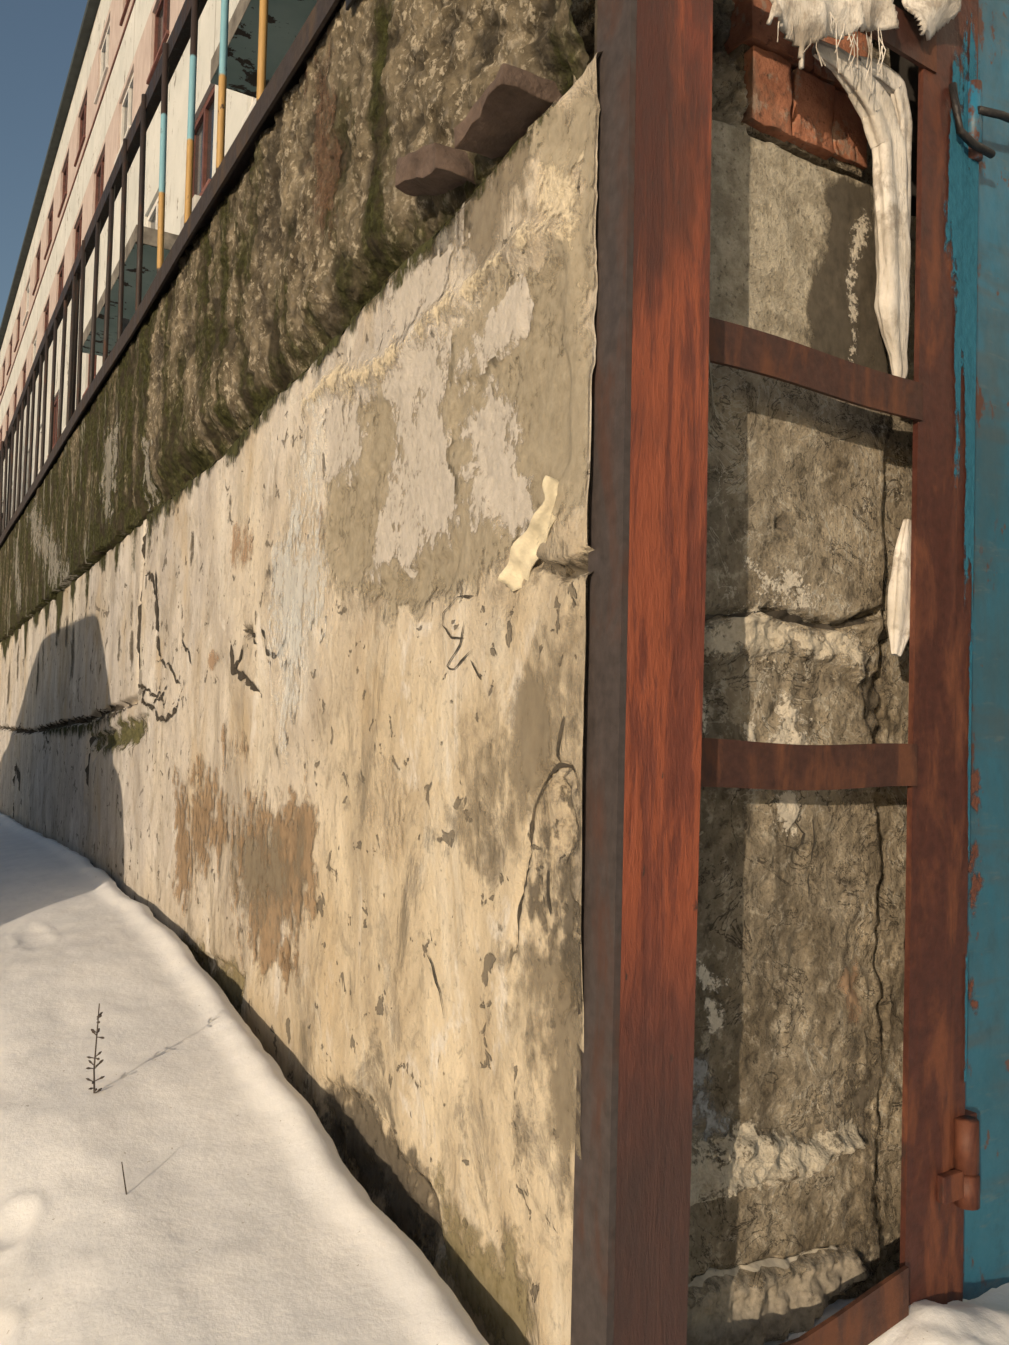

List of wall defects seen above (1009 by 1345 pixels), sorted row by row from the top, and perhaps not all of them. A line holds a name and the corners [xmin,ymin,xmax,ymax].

flaking render [319,75,597,627]
water stain [99,424,118,518]
water stain [141,434,159,511]
water stain [14,497,79,614]
spalling [36,618,79,696]
crack [0,534,191,818]
spalling [106,602,133,671]
crack [230,626,286,694]
rust [970,769,981,812]
rust [968,841,983,915]
water stain [179,931,246,1014]
water stain [316,1076,535,1345]